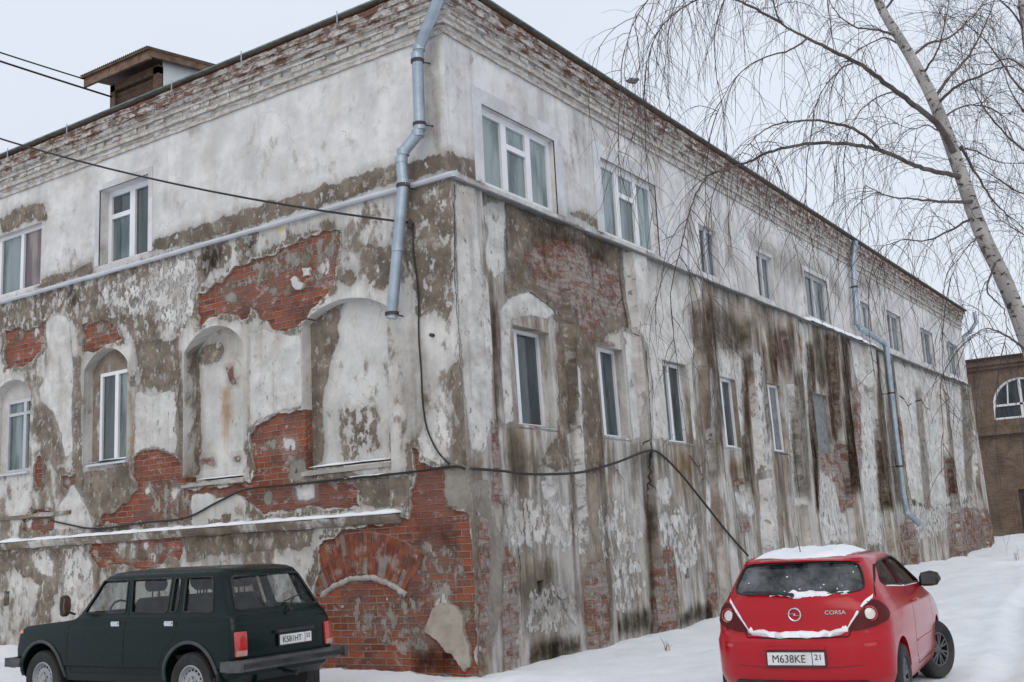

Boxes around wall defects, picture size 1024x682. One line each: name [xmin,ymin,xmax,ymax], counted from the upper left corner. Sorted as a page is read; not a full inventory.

spalling [0,151,779,677]
water stain [744,383,753,488]
water stain [792,335,861,508]
water stain [876,360,900,510]